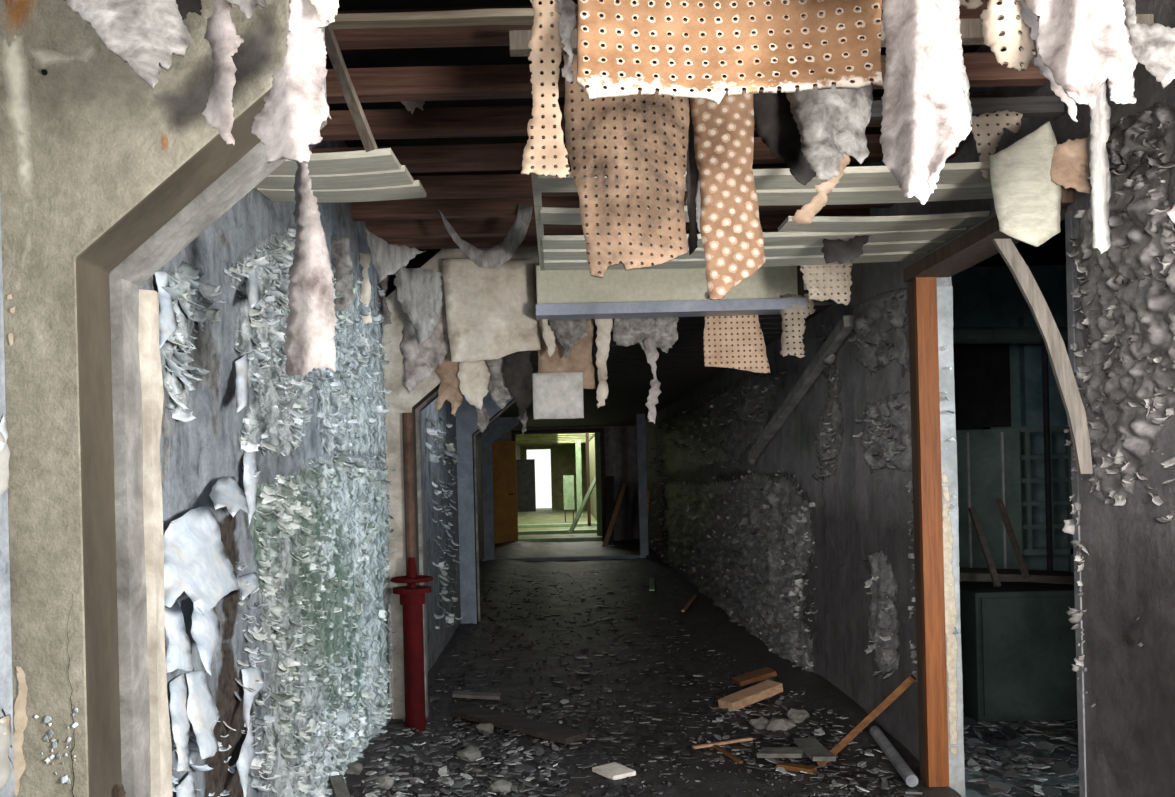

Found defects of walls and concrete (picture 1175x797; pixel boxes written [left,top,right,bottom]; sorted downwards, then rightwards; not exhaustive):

peeling [157,227,398,797]
peeling [655,370,818,672]
peeling [812,354,918,683]
peeling [1062,103,1175,680]
spalling [113,785,126,797]